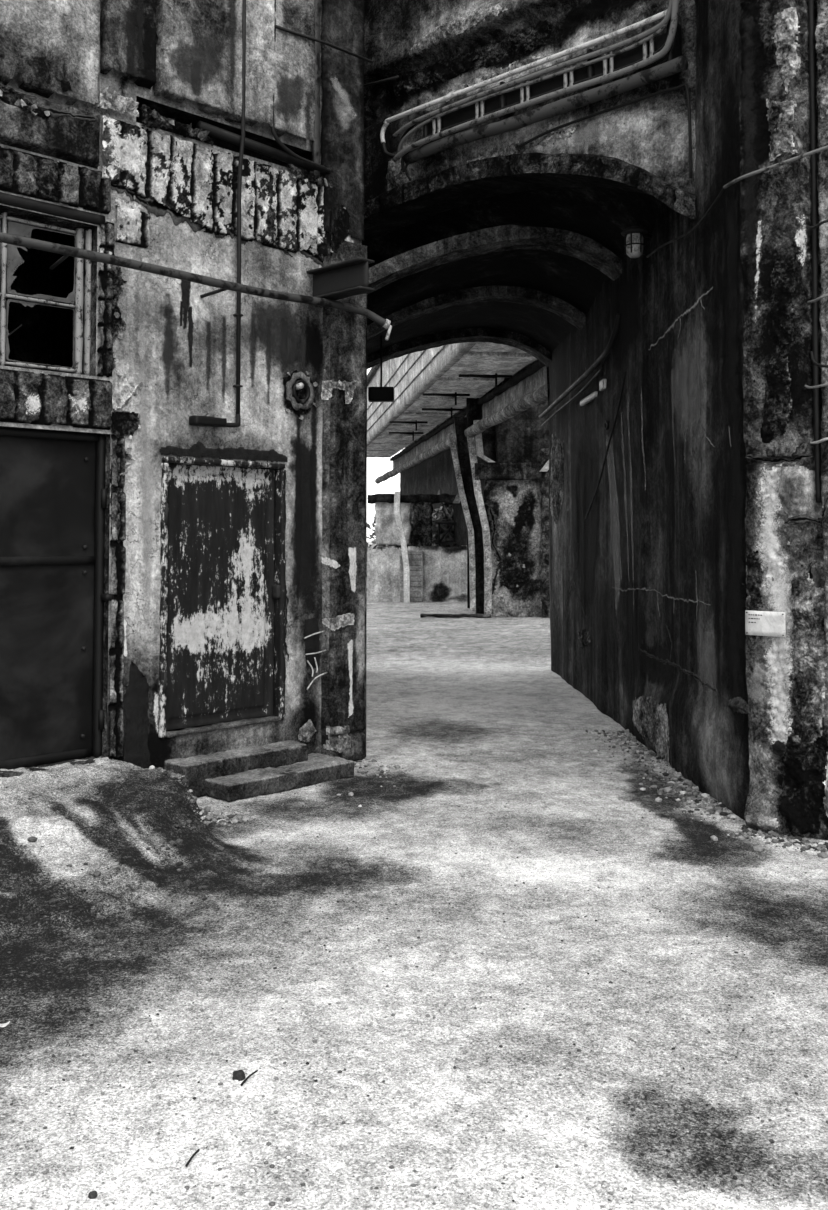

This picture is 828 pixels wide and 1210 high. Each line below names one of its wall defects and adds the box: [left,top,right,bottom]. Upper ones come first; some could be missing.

peeling [97,86,214,173]
spalling [32,160,65,198]
peeling [167,158,188,187]
spalling [287,164,333,188]
peeling [116,195,142,222]
spalling [300,203,351,252]
water stain [161,295,184,399]
water stain [206,317,226,398]
peeling [22,390,41,414]
peeling [69,394,89,418]
crack [614,573,718,693]